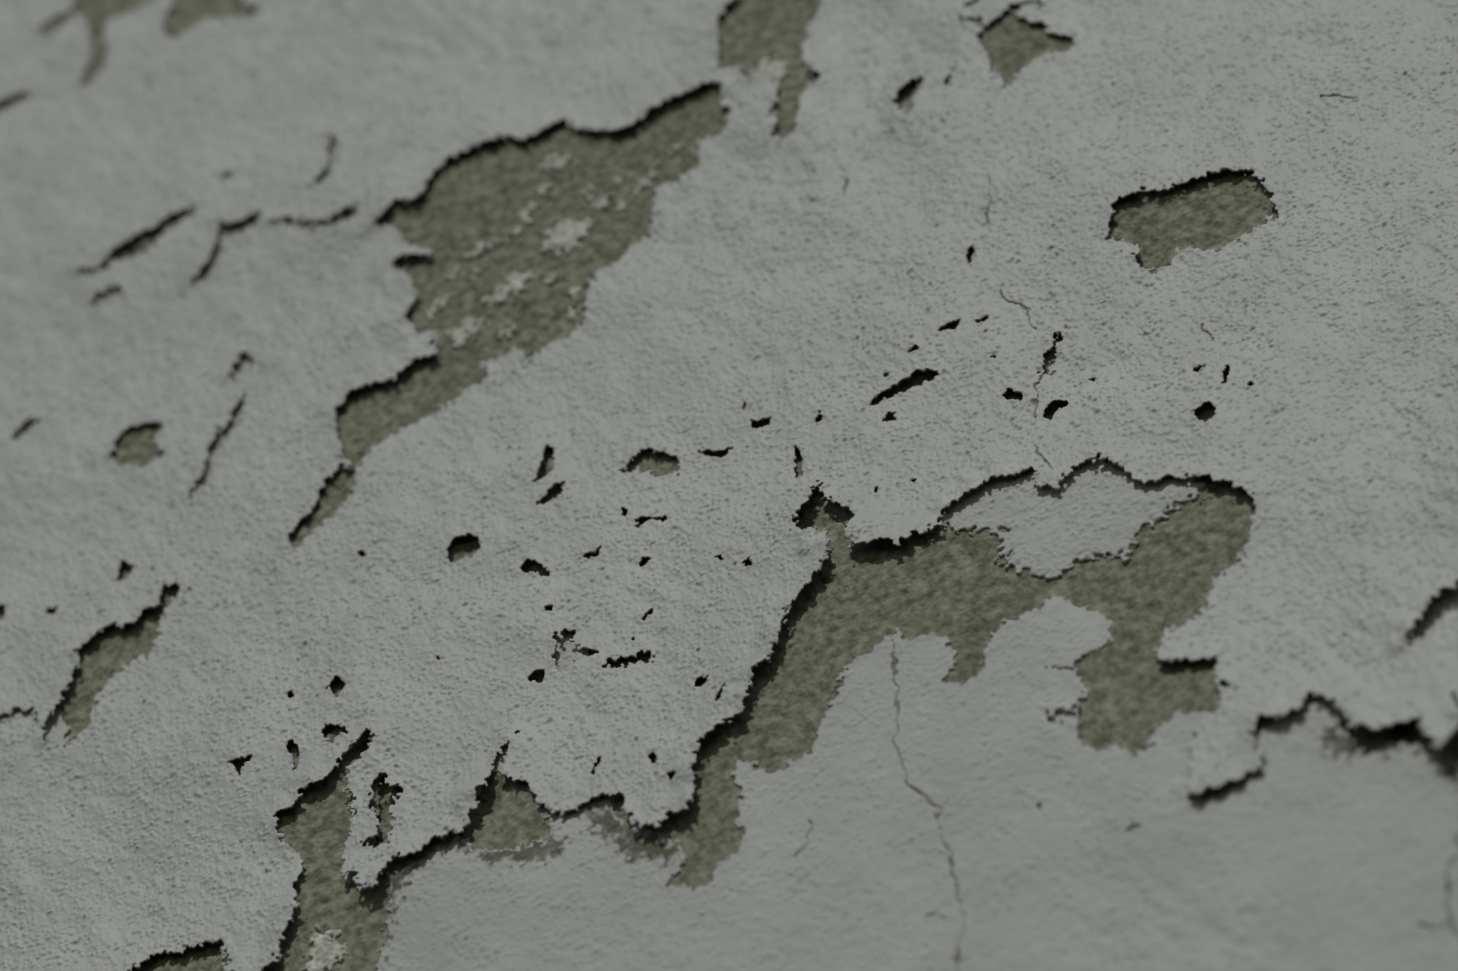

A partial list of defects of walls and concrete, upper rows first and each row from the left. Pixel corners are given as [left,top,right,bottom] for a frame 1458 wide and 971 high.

peeling [29,0,270,95]
peeling [935,0,1087,99]
peeling [249,0,875,492]
peeling [1091,157,1300,281]
peeling [102,410,171,478]
peeling [110,441,1269,971]
spalling [1184,671,1458,796]
crack [794,819,813,857]
crack [890,635,966,971]
crack [1417,836,1458,935]